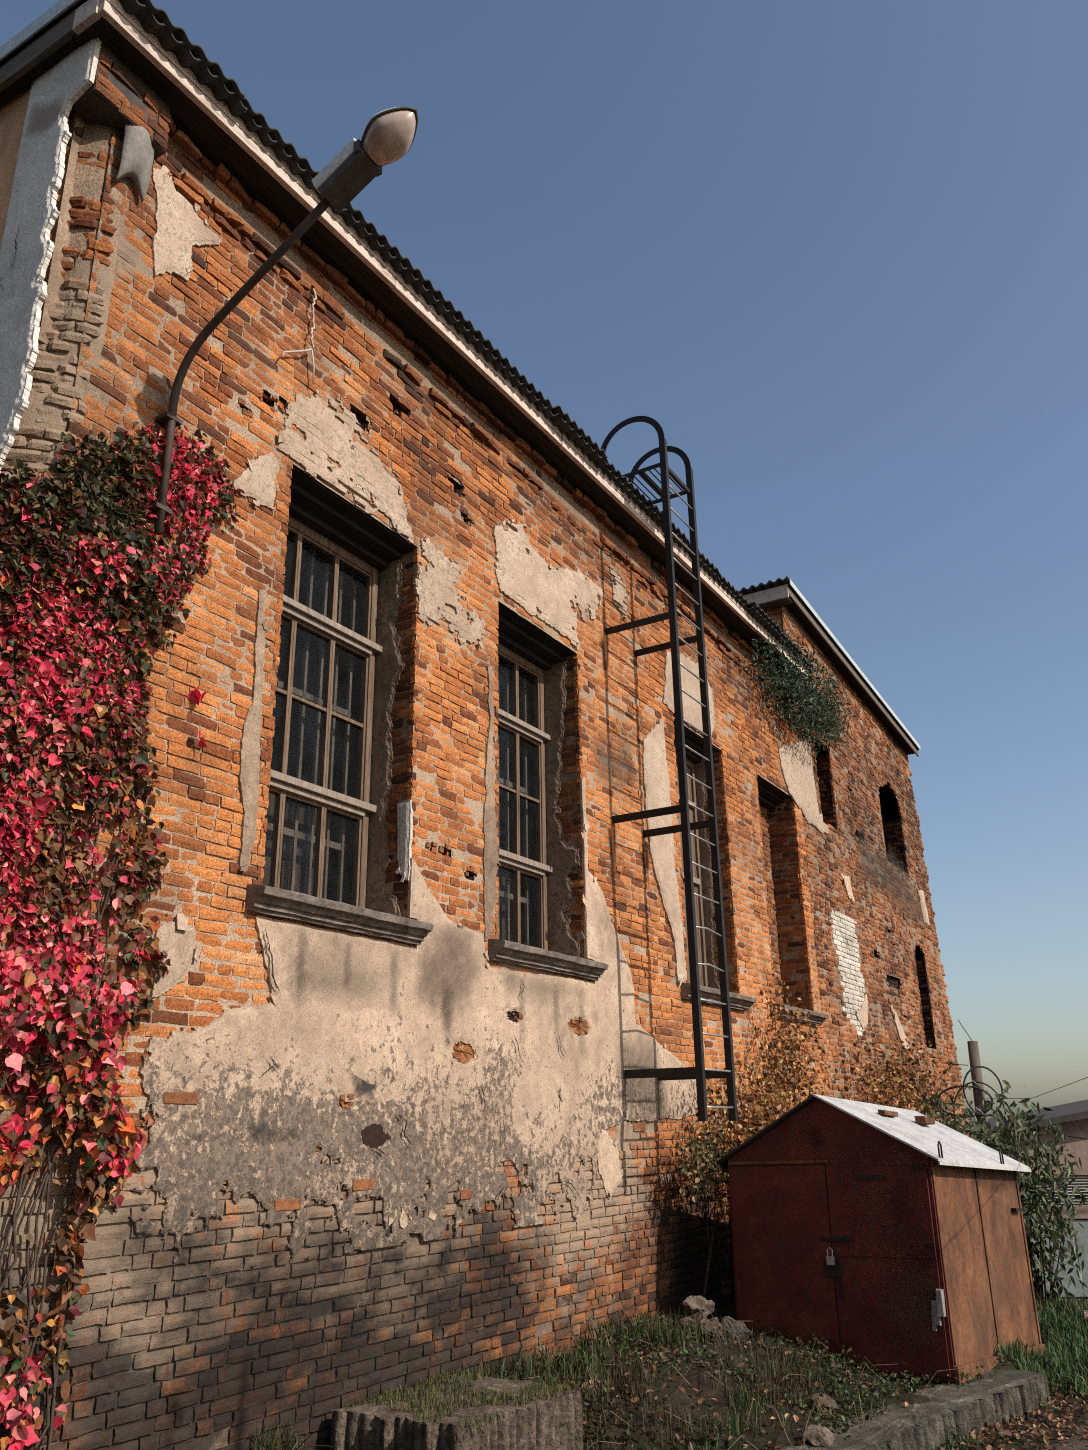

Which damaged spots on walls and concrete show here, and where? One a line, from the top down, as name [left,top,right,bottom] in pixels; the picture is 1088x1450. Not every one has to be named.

flaking render [151,165,222,281]
flaking render [111,389,697,1262]
flaking render [778,739,830,835]
flaking render [855,994,868,1029]
leakage [355,1075,376,1096]